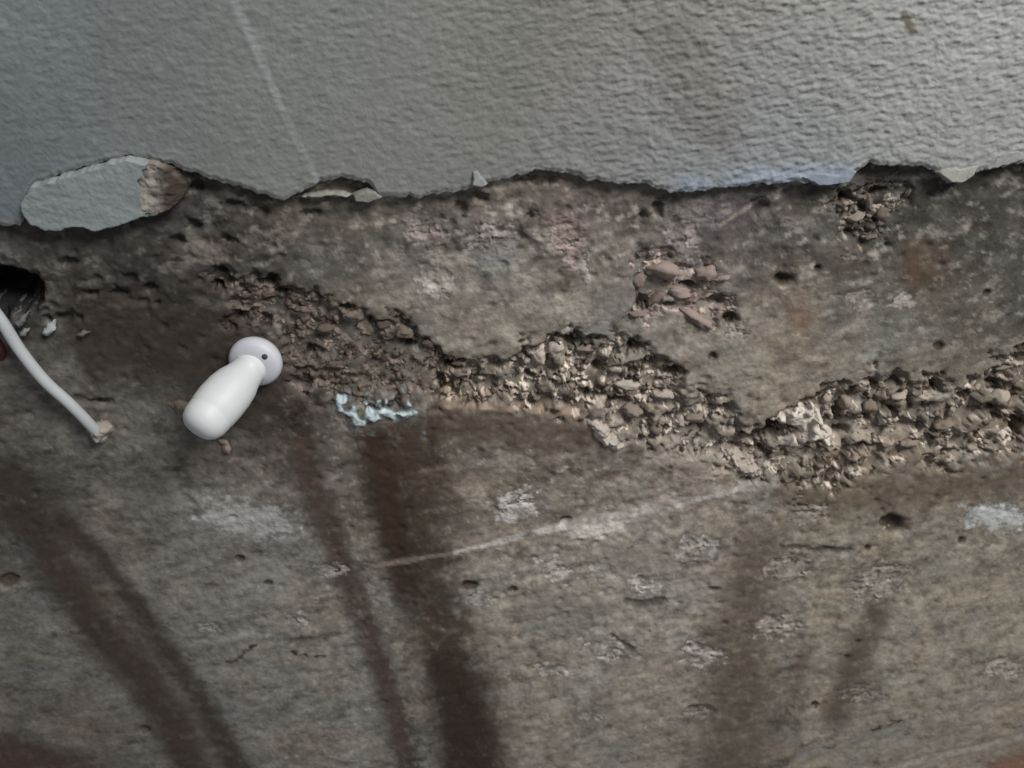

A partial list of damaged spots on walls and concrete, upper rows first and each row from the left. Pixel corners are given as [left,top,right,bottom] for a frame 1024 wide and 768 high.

peeling [295,186,382,203]
peeling [471,171,488,187]
peeling [802,169,857,186]
peeling [932,151,1024,183]
spalling [413,263,455,302]
spalling [845,288,916,313]
damp [190,494,303,541]
damp [287,409,422,768]
damp [336,393,523,768]
damp [0,466,199,768]
damp [57,517,245,768]
damp [709,539,767,768]